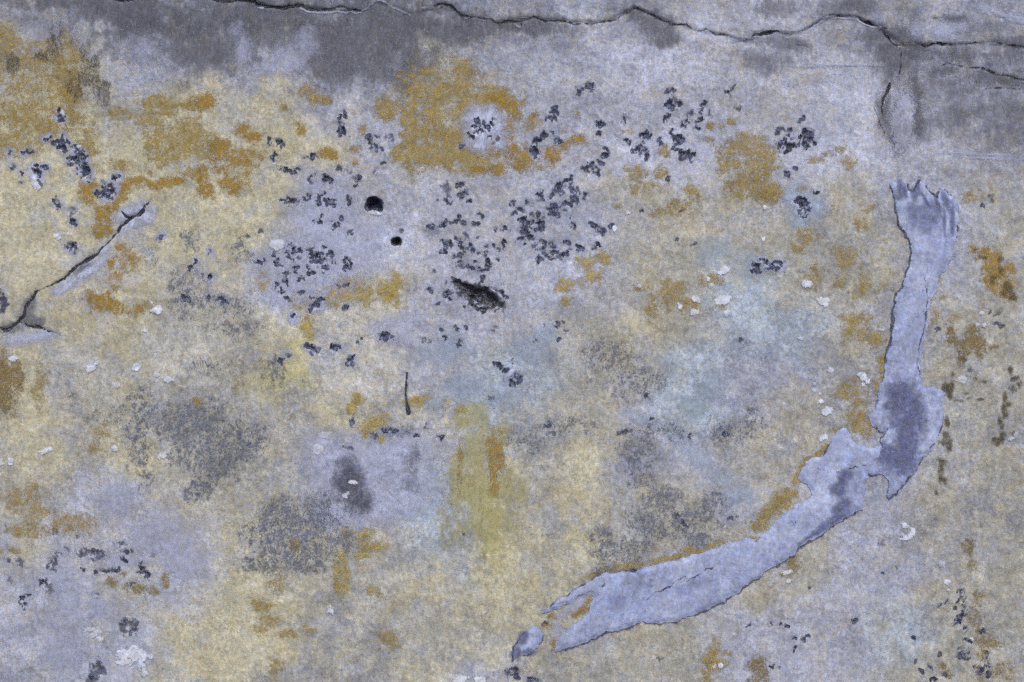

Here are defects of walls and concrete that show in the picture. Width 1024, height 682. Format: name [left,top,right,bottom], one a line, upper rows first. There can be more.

crack [0,202,149,335]
rust [0,21,267,317]
damp [34,0,565,88]
damp [231,175,379,307]
rust [352,57,587,181]
spalling [425,116,617,314]
crack [215,0,1024,150]
rust [705,118,784,206]
spalling [749,255,785,274]
spalling [792,191,820,219]
damp [237,423,433,576]
spalling [938,579,992,679]